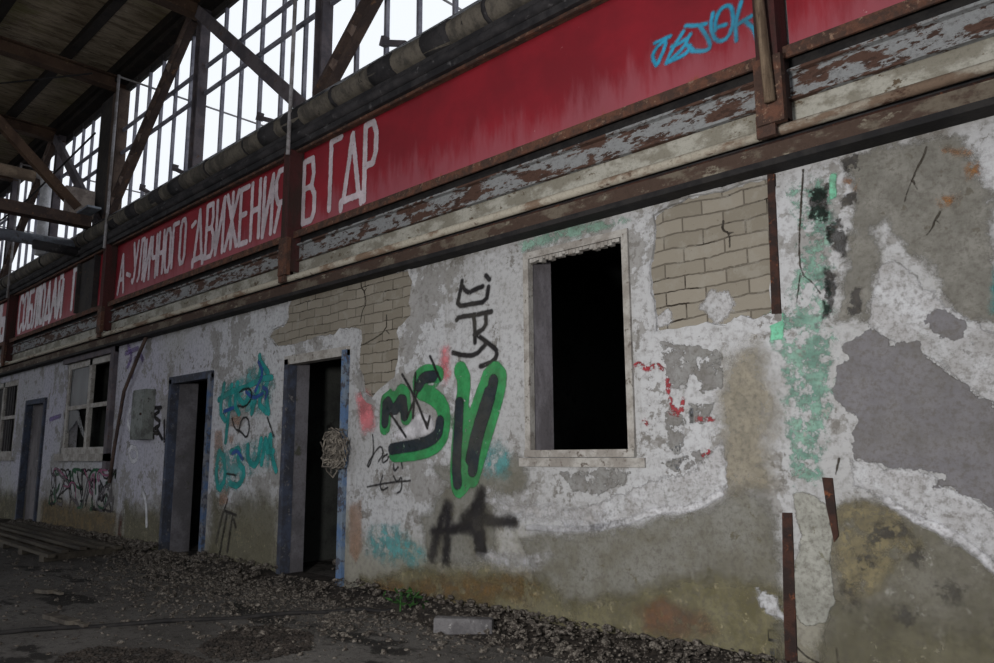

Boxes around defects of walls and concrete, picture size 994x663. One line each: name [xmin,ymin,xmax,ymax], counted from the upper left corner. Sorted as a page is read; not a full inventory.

flaking render [265,269,421,408]
flaking render [639,134,994,626]
damp [359,348,785,663]
peeling [559,467,631,495]
corrosion [782,513,798,663]
corrosion [822,477,839,542]
damp [821,496,994,663]